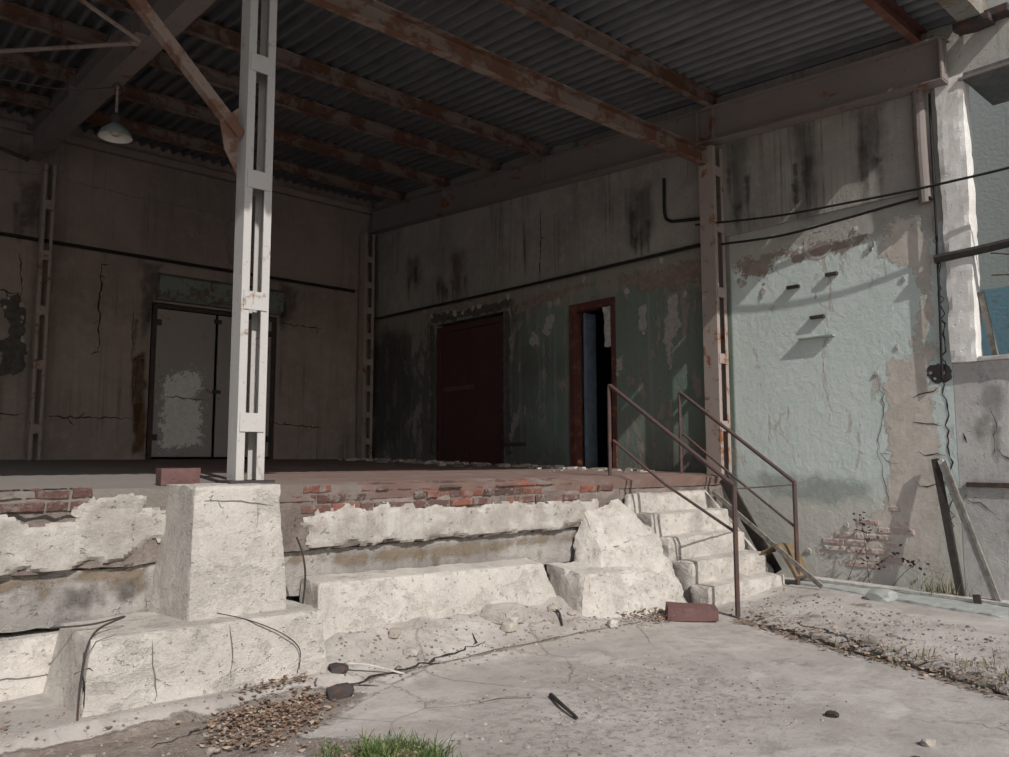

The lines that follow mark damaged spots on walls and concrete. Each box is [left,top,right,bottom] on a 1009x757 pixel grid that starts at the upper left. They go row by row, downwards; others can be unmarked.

spalling [0,293,28,376]
crack [90,264,108,355]
peeling [154,363,208,454]
peeling [663,291,683,370]
peeling [735,203,952,582]
crack [877,220,995,527]
crack [989,407,1009,459]
flaking render [0,487,166,578]
crack [0,673,48,681]